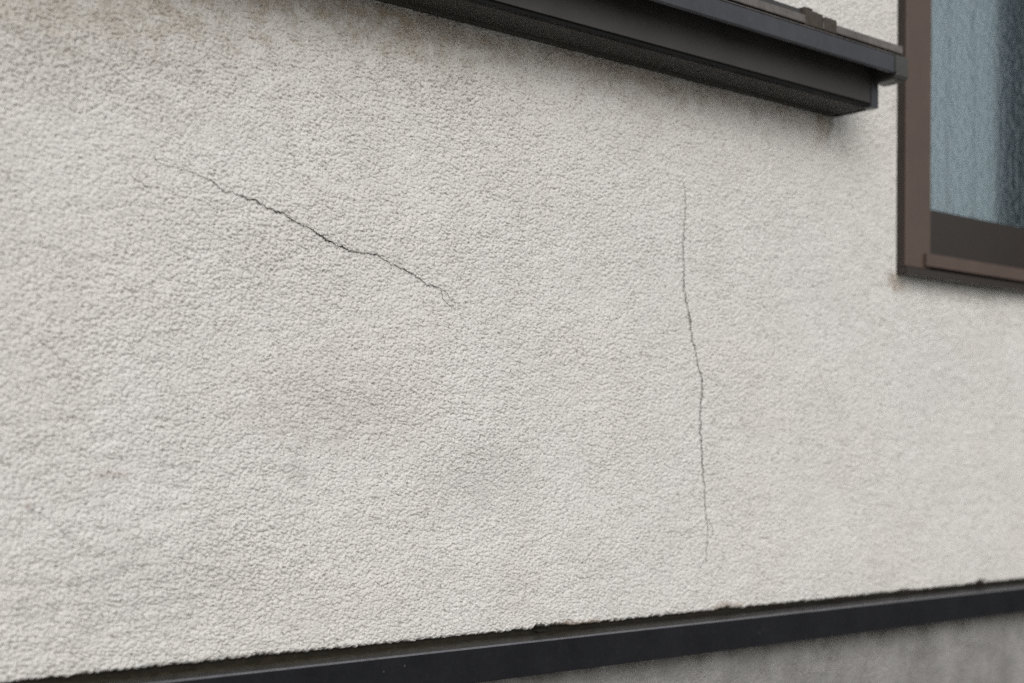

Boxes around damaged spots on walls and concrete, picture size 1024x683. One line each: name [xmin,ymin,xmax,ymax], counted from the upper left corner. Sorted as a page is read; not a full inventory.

crack [131,155,455,308]
crack [683,187,714,561]